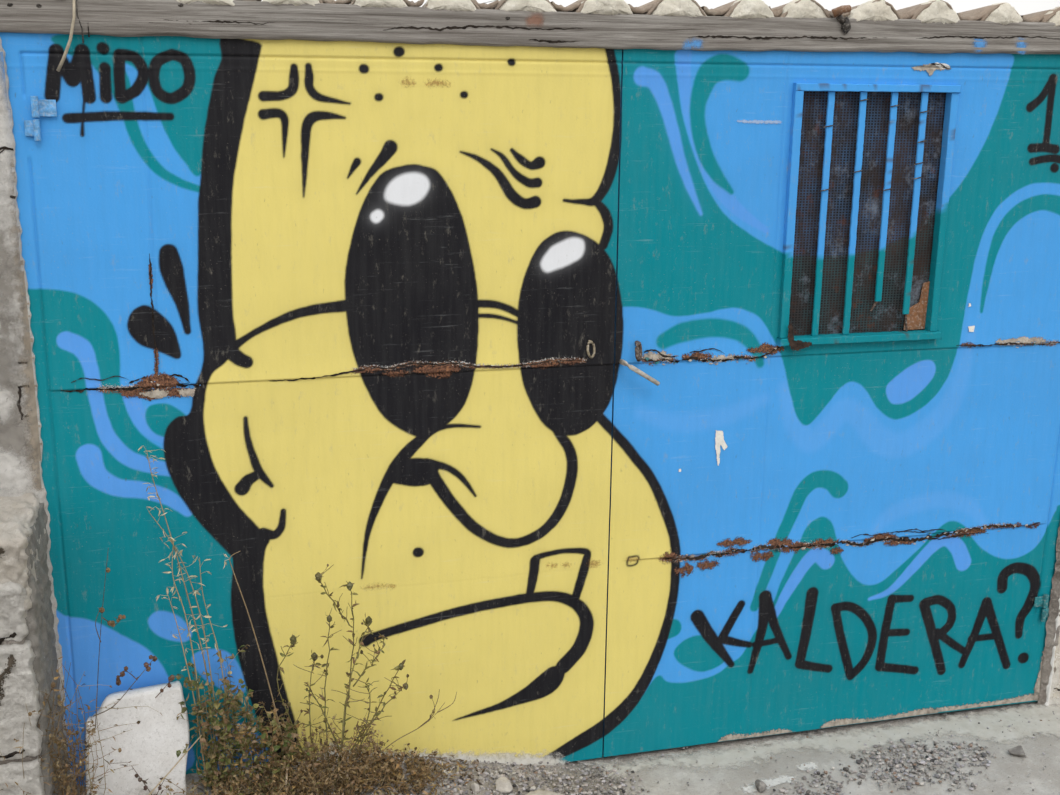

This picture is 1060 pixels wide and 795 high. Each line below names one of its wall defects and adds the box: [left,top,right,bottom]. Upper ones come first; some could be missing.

corrosion [788,323,812,351]
corrosion [97,373,196,401]
peeling [715,430,727,466]